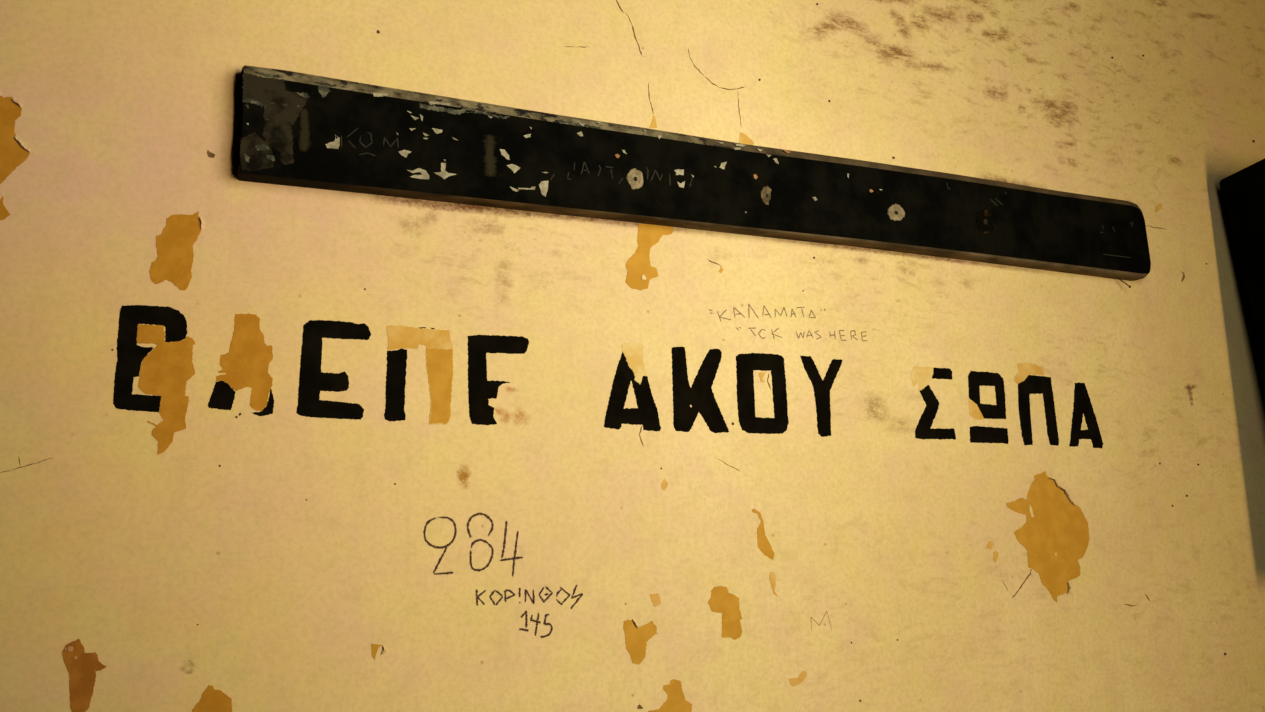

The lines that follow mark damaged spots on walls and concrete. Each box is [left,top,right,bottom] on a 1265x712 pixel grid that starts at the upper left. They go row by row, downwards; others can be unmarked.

crack [616,0,653,112]
crack [688,48,744,125]
peeling [0,91,32,220]
peeling [149,211,205,290]
peeling [625,223,674,290]
peeling [137,324,195,454]
peeling [216,313,273,411]
peeling [1006,471,1090,602]
peeling [623,593,661,664]
peeling [708,586,742,640]
peeling [62,639,107,712]
peeling [637,679,692,712]